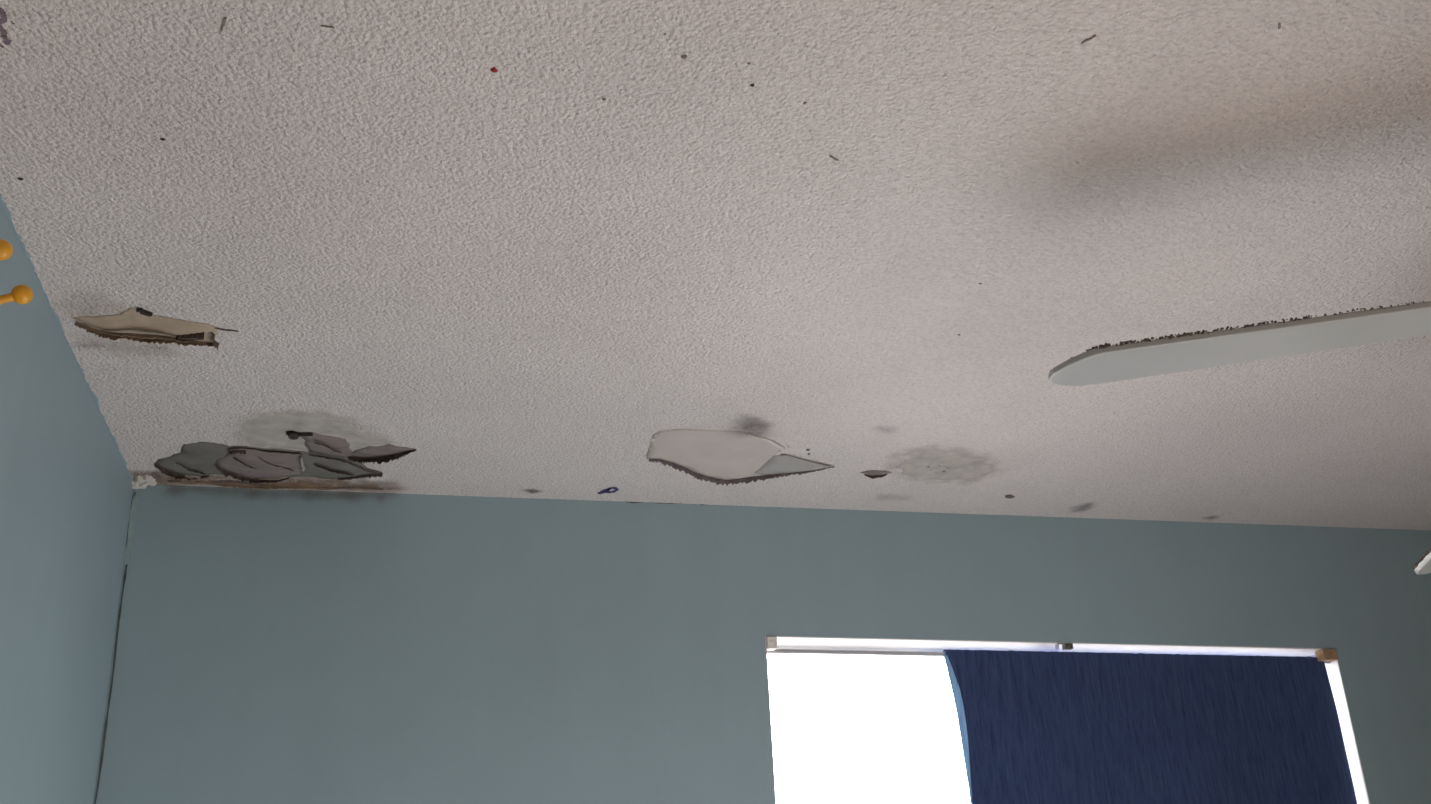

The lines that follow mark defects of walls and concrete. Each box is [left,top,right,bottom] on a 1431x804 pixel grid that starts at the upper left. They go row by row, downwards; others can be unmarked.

peeling [245,414,385,471]
peeling [647,429,834,486]